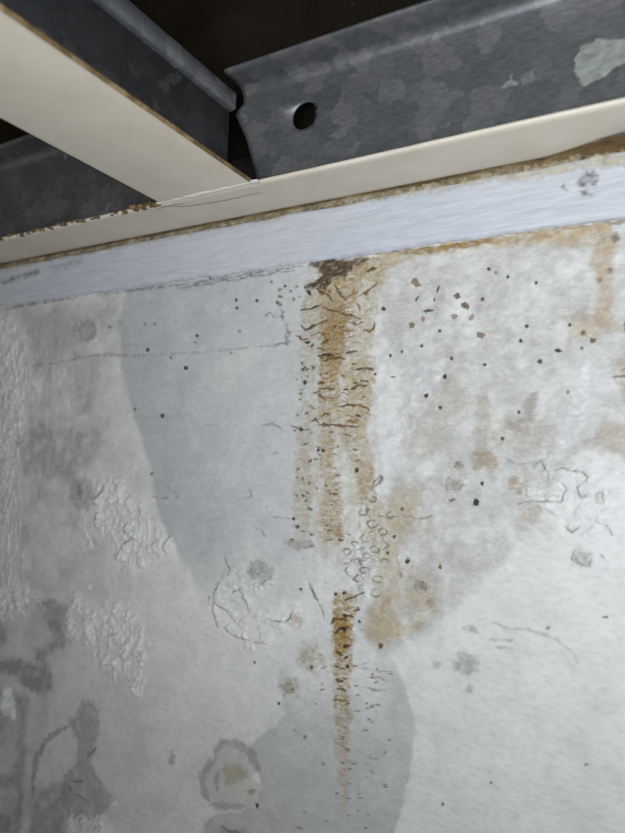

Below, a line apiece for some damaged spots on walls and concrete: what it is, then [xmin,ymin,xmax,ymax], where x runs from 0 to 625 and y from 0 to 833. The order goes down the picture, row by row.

corrosion [298,223,618,469]
corrosion [298,473,363,541]
corrosion [331,592,364,744]